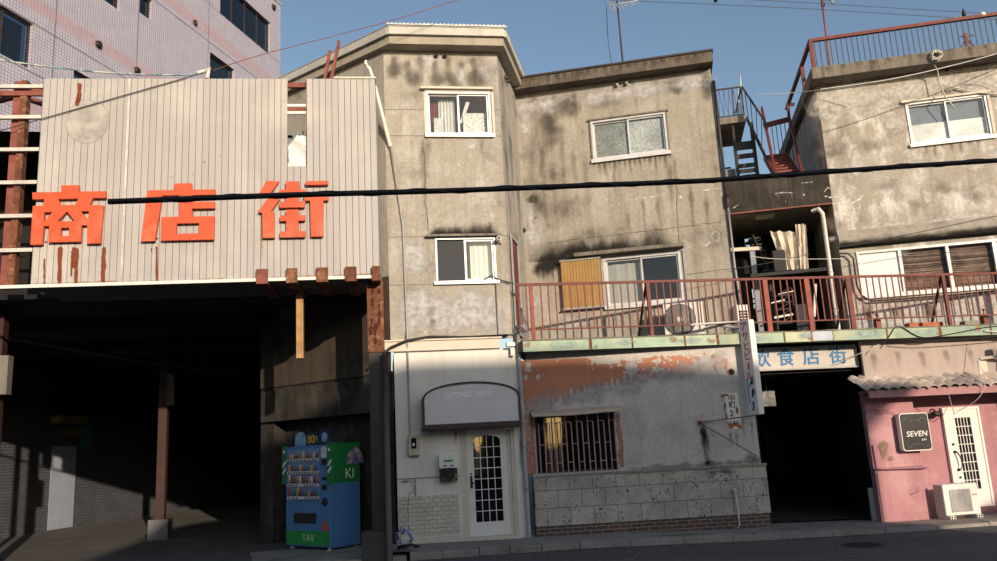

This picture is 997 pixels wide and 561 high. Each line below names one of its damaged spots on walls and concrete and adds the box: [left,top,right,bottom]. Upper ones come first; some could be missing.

water stain [389,56,487,86]
water stain [526,211,539,244]
corrosion [57,247,79,284]
water stain [535,237,665,275]
corrosion [369,274,381,344]
peeling [521,353,728,475]